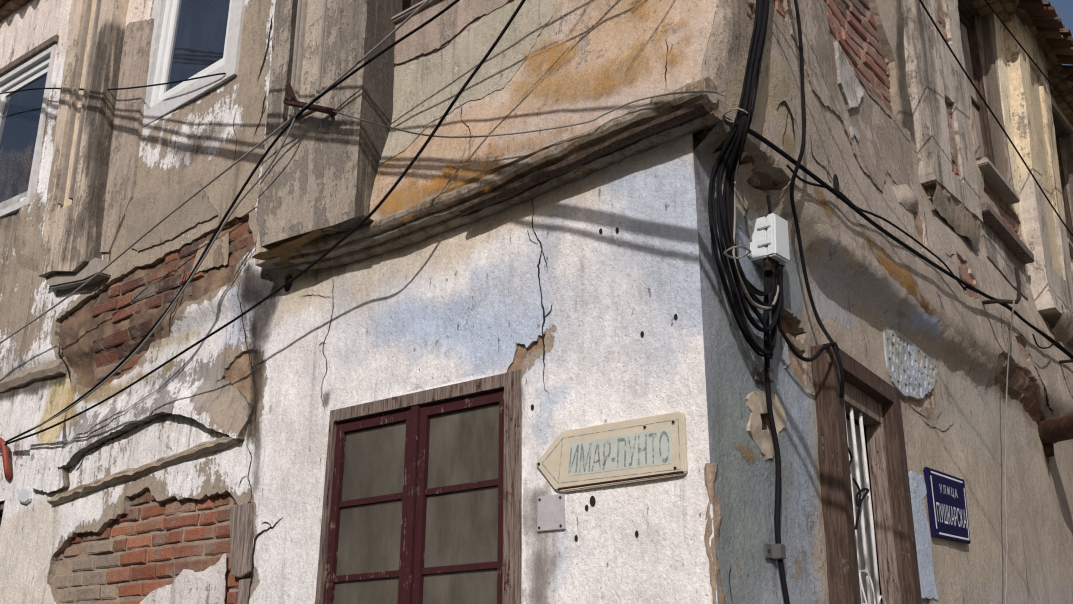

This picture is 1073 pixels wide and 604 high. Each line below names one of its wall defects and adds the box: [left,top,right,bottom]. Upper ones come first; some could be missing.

damp [518,42,640,95]
flaking render [772,0,915,192]
spalling [945,100,960,181]
flaking render [59,181,256,388]
crack [527,202,552,392]
spalling [745,391,786,460]
flaking render [780,335,805,384]
flaking render [994,335,1042,424]
flaking render [53,490,251,604]
flaking render [908,471,938,604]